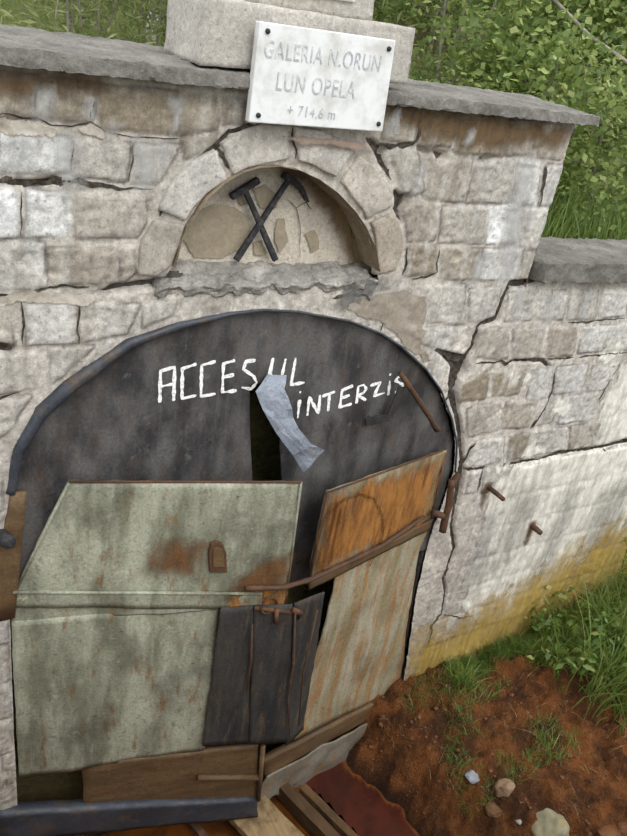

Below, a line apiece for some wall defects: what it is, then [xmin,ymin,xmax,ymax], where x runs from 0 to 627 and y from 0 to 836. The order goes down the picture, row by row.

crack [0,87,178,238]
crack [207,123,263,169]
crack [367,121,421,221]
crack [539,167,548,206]
crack [402,247,440,279]
crack [333,293,371,301]
crack [428,279,627,642]
corrosion [316,459,441,572]
corrosion [151,542,201,571]
corrosion [229,558,288,607]
corrosion [410,525,627,677]